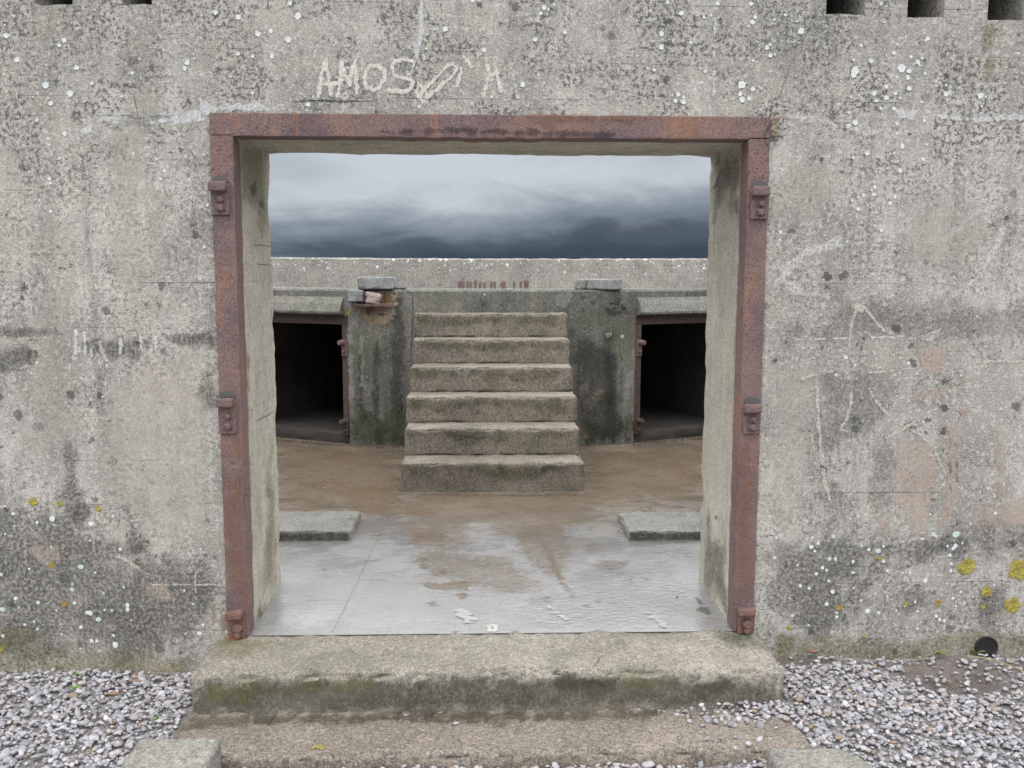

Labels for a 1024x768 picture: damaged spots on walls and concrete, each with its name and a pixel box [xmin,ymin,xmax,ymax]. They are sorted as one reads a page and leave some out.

rust [381,114,615,139]
rust [353,291,392,307]
damp [278,299,703,606]
damp [0,446,214,666]
damp [772,541,872,635]
damp [908,535,960,562]